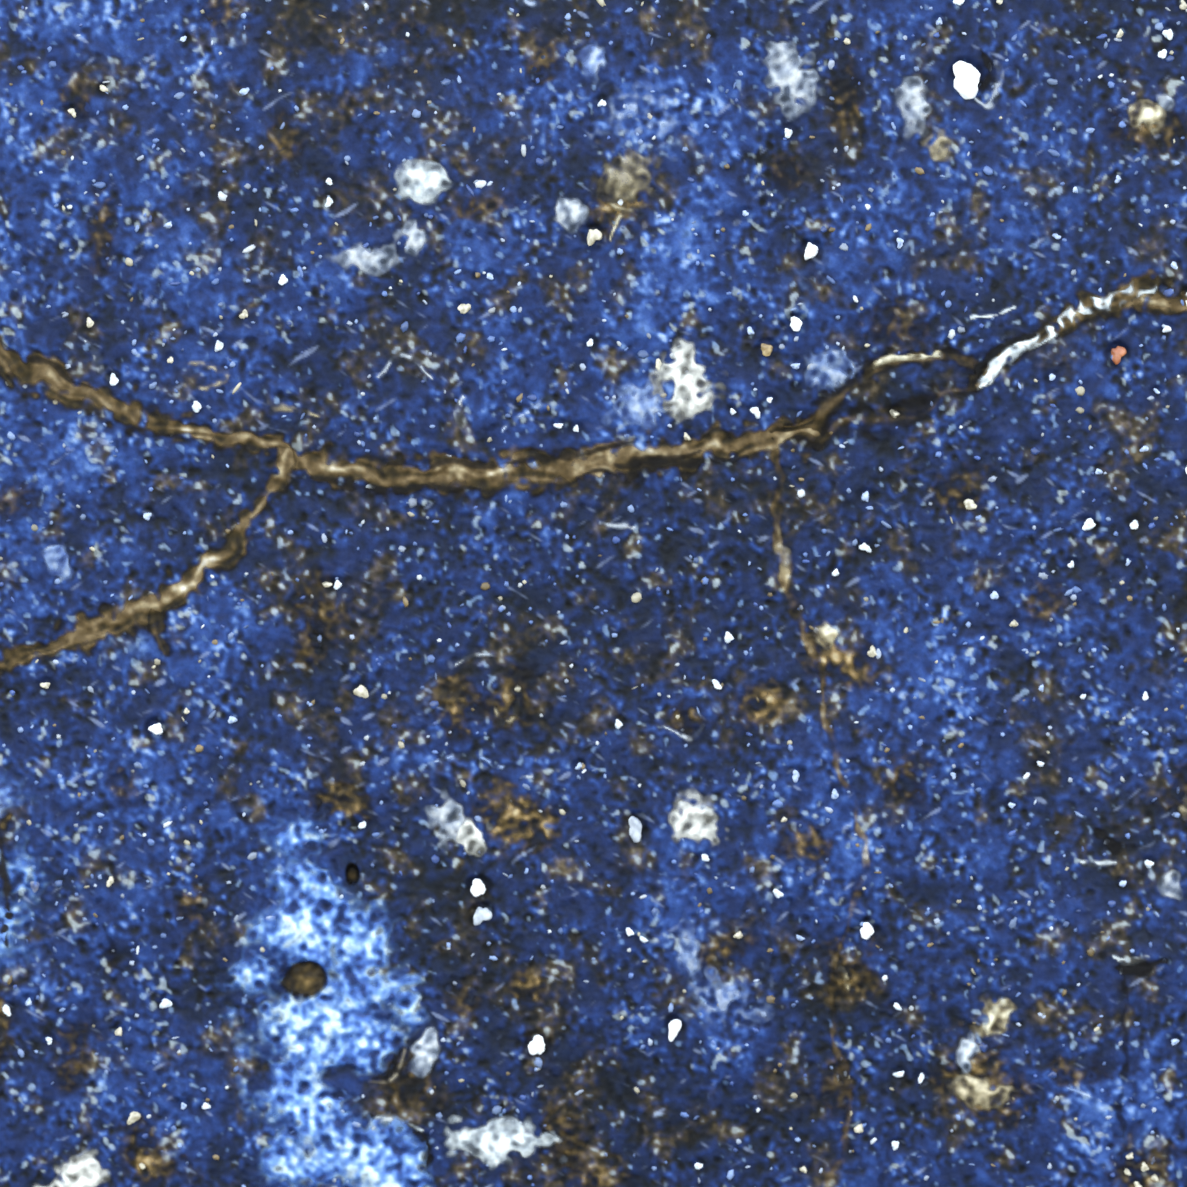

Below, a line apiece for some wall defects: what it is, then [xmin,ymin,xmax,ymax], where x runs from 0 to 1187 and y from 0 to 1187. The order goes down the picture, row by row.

crack [0,270,1187,786]
crack [855,811,867,858]
crack [1094,828,1127,854]
crack [832,1029,849,1089]
crack [826,1117,849,1187]